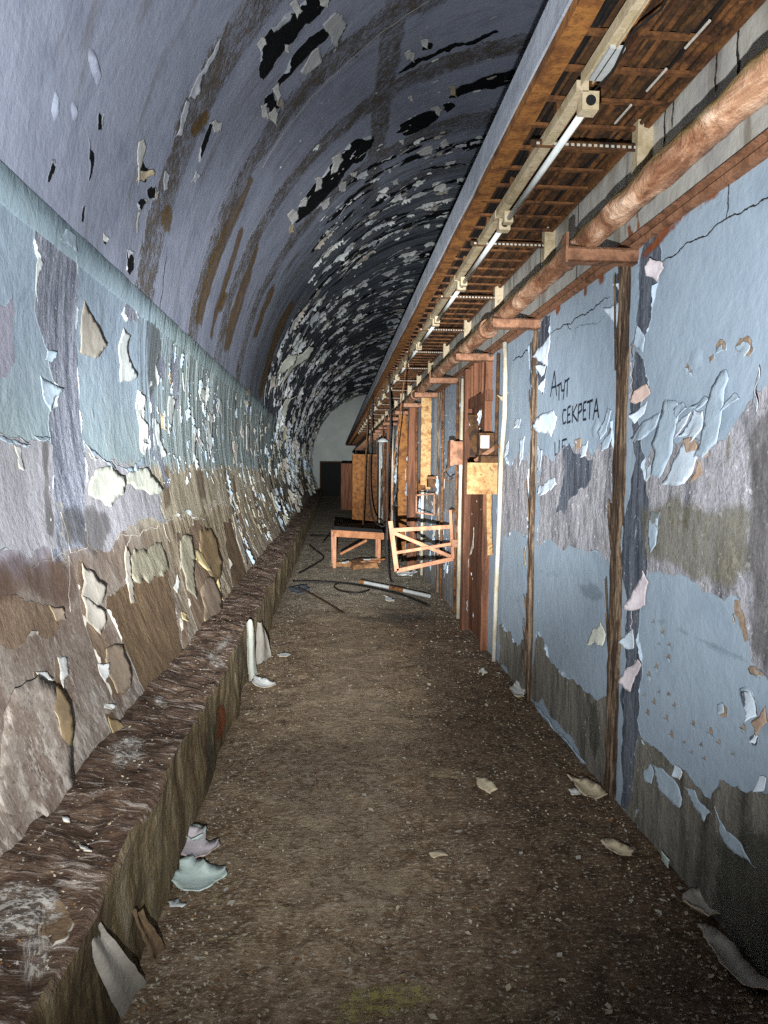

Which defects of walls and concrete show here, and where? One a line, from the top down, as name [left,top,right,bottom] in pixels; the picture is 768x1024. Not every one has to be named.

peeling [176,38,221,136]
peeling [257,0,348,126]
peeling [398,16,500,74]
crack [662,184,768,262]
peeling [0,70,516,733]
peeling [496,235,768,979]
peeling [0,655,75,817]